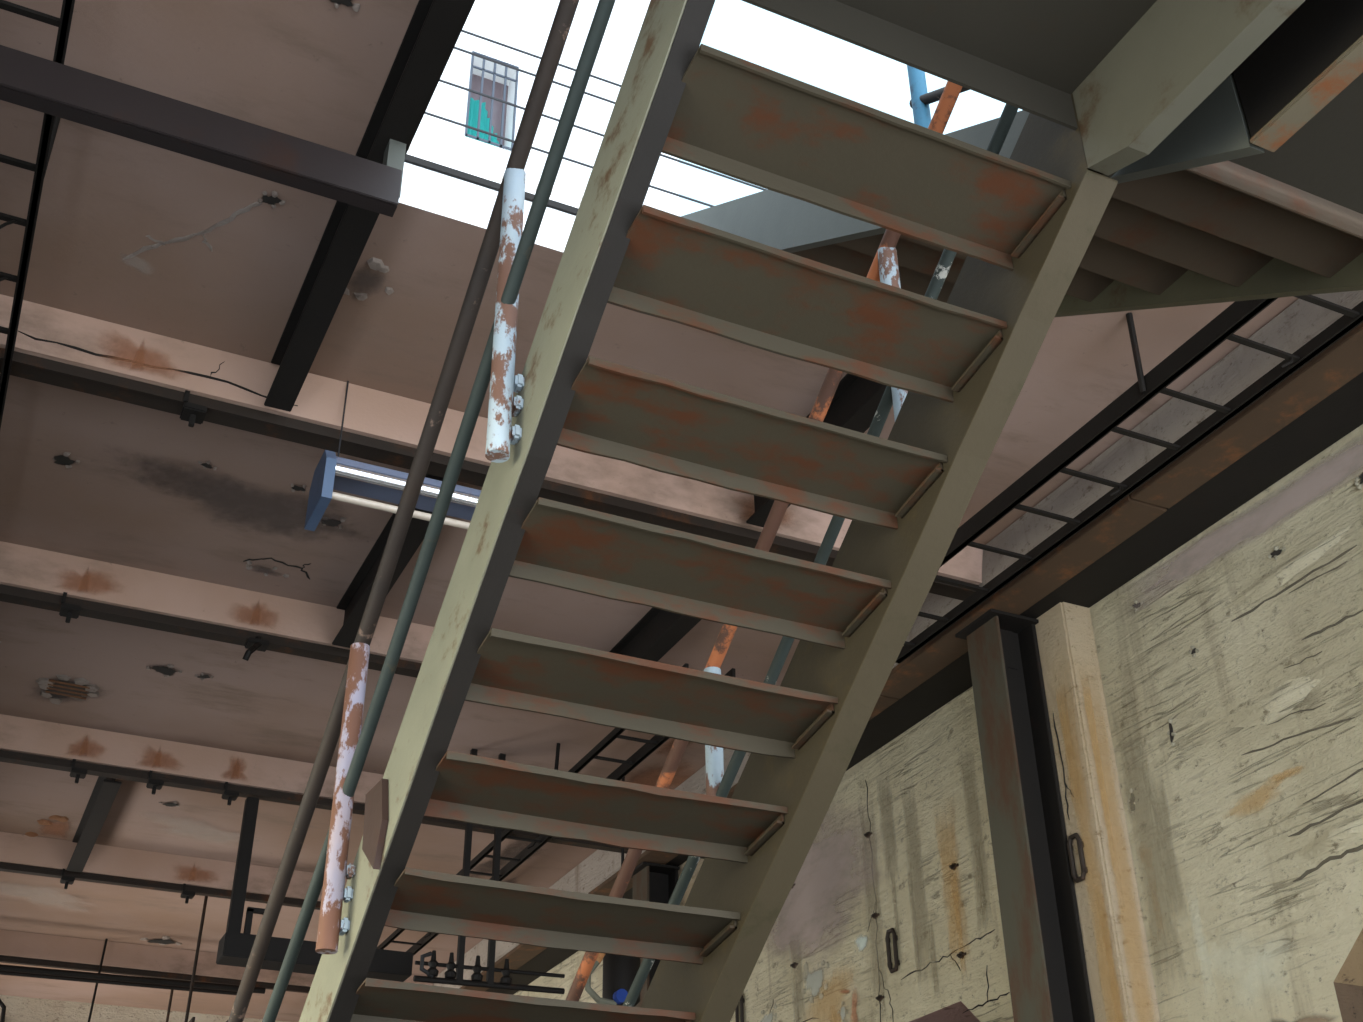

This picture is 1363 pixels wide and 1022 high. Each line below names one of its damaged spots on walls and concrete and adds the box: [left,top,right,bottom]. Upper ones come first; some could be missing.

rust [65,575,109,590]
crack [243,558,311,579]
spalling [36,675,100,705]
damp [965,786,984,906]
damp [865,800,937,977]